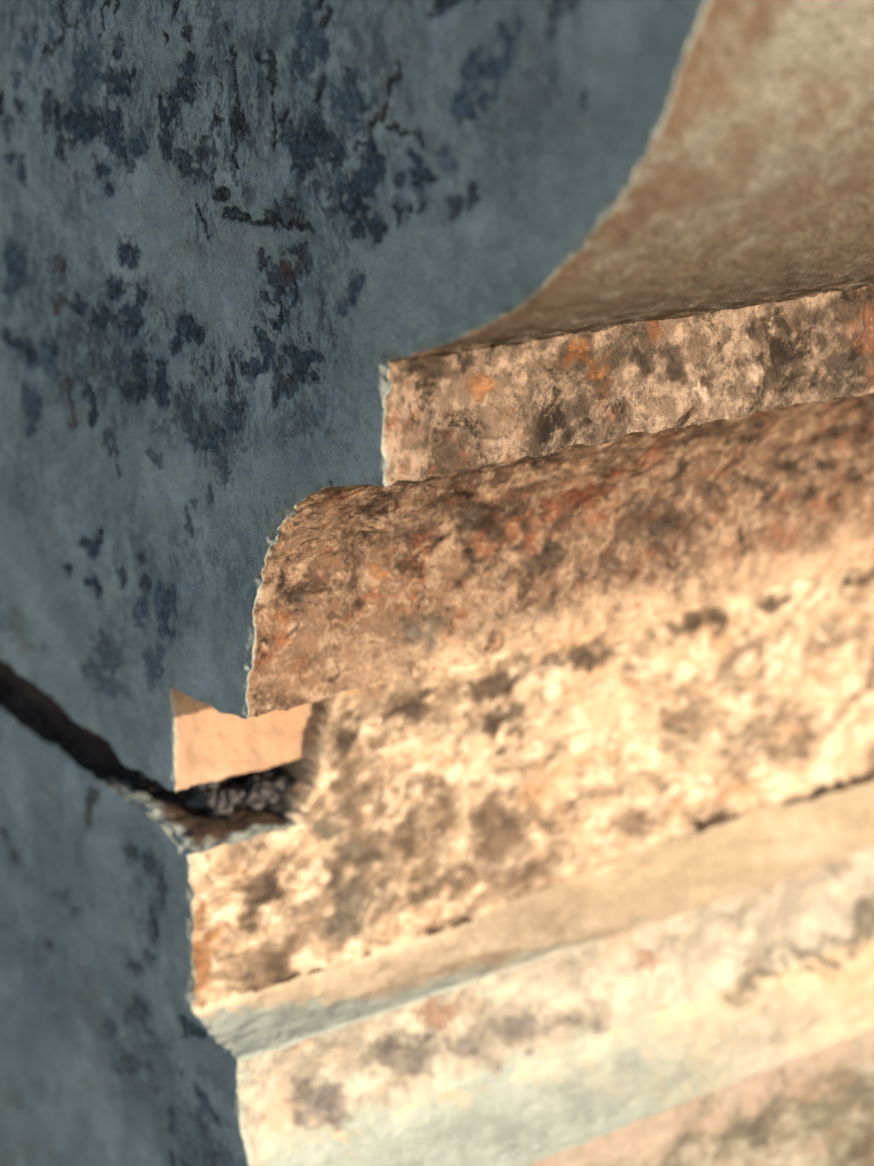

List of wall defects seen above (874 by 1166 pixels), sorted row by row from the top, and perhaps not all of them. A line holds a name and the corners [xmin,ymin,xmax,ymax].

rust [394,353,495,401]
rust [666,346,707,403]
rust [744,334,763,382]
rust [781,457,828,480]
leakage [464,551,476,577]
rust [525,539,562,573]
leakage [668,608,729,637]
leakage [761,592,799,614]
leakage [542,639,612,672]
leakage [379,690,431,743]
leakage [464,671,528,756]
rust [193,903,228,1000]